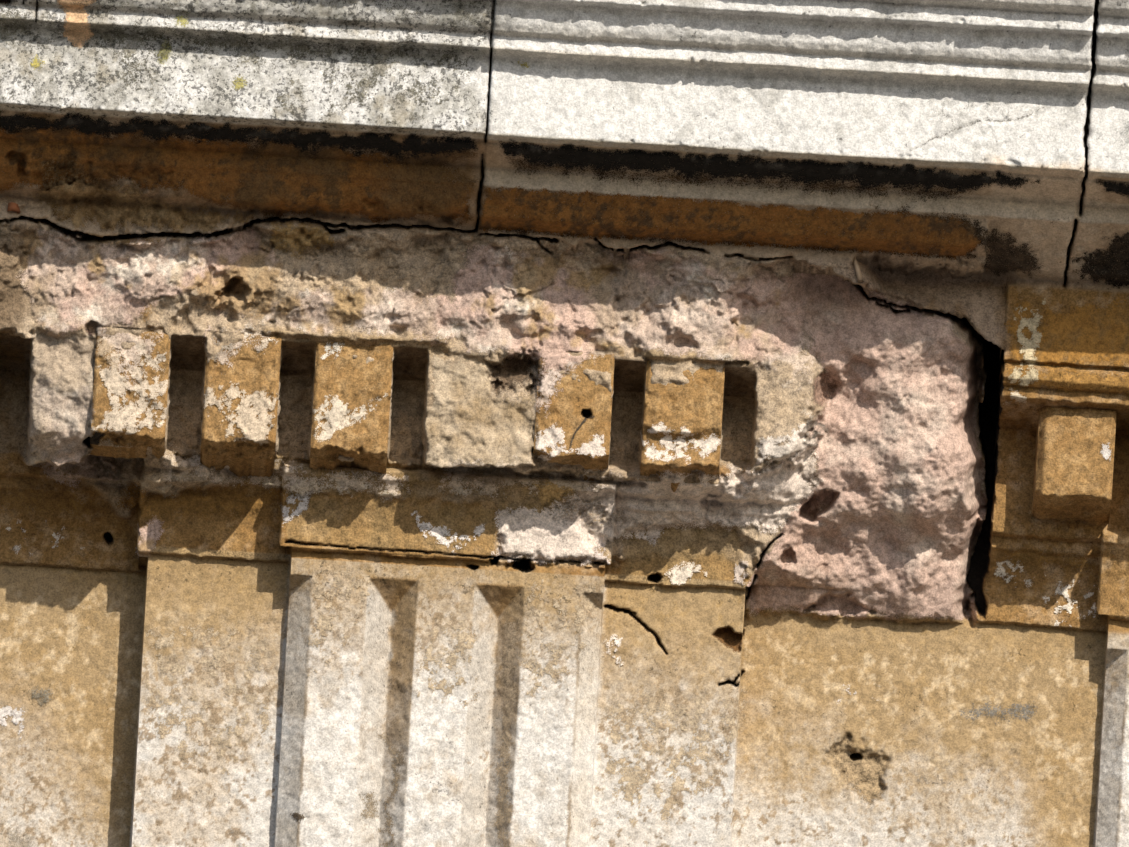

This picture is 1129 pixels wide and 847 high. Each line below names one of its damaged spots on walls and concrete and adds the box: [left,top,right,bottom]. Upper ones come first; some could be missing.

rust [57,0,96,48]
crack [2,2,559,252]
water stain [499,140,1040,194]
crack [1064,0,1099,284]
water stain [1096,179,1129,199]
water stain [954,215,1043,277]
water stain [1071,232,1129,293]
crack [857,284,990,345]
spalling [15,147,987,709]
crack [285,540,608,566]
crack [746,534,782,599]
crack [604,605,667,654]